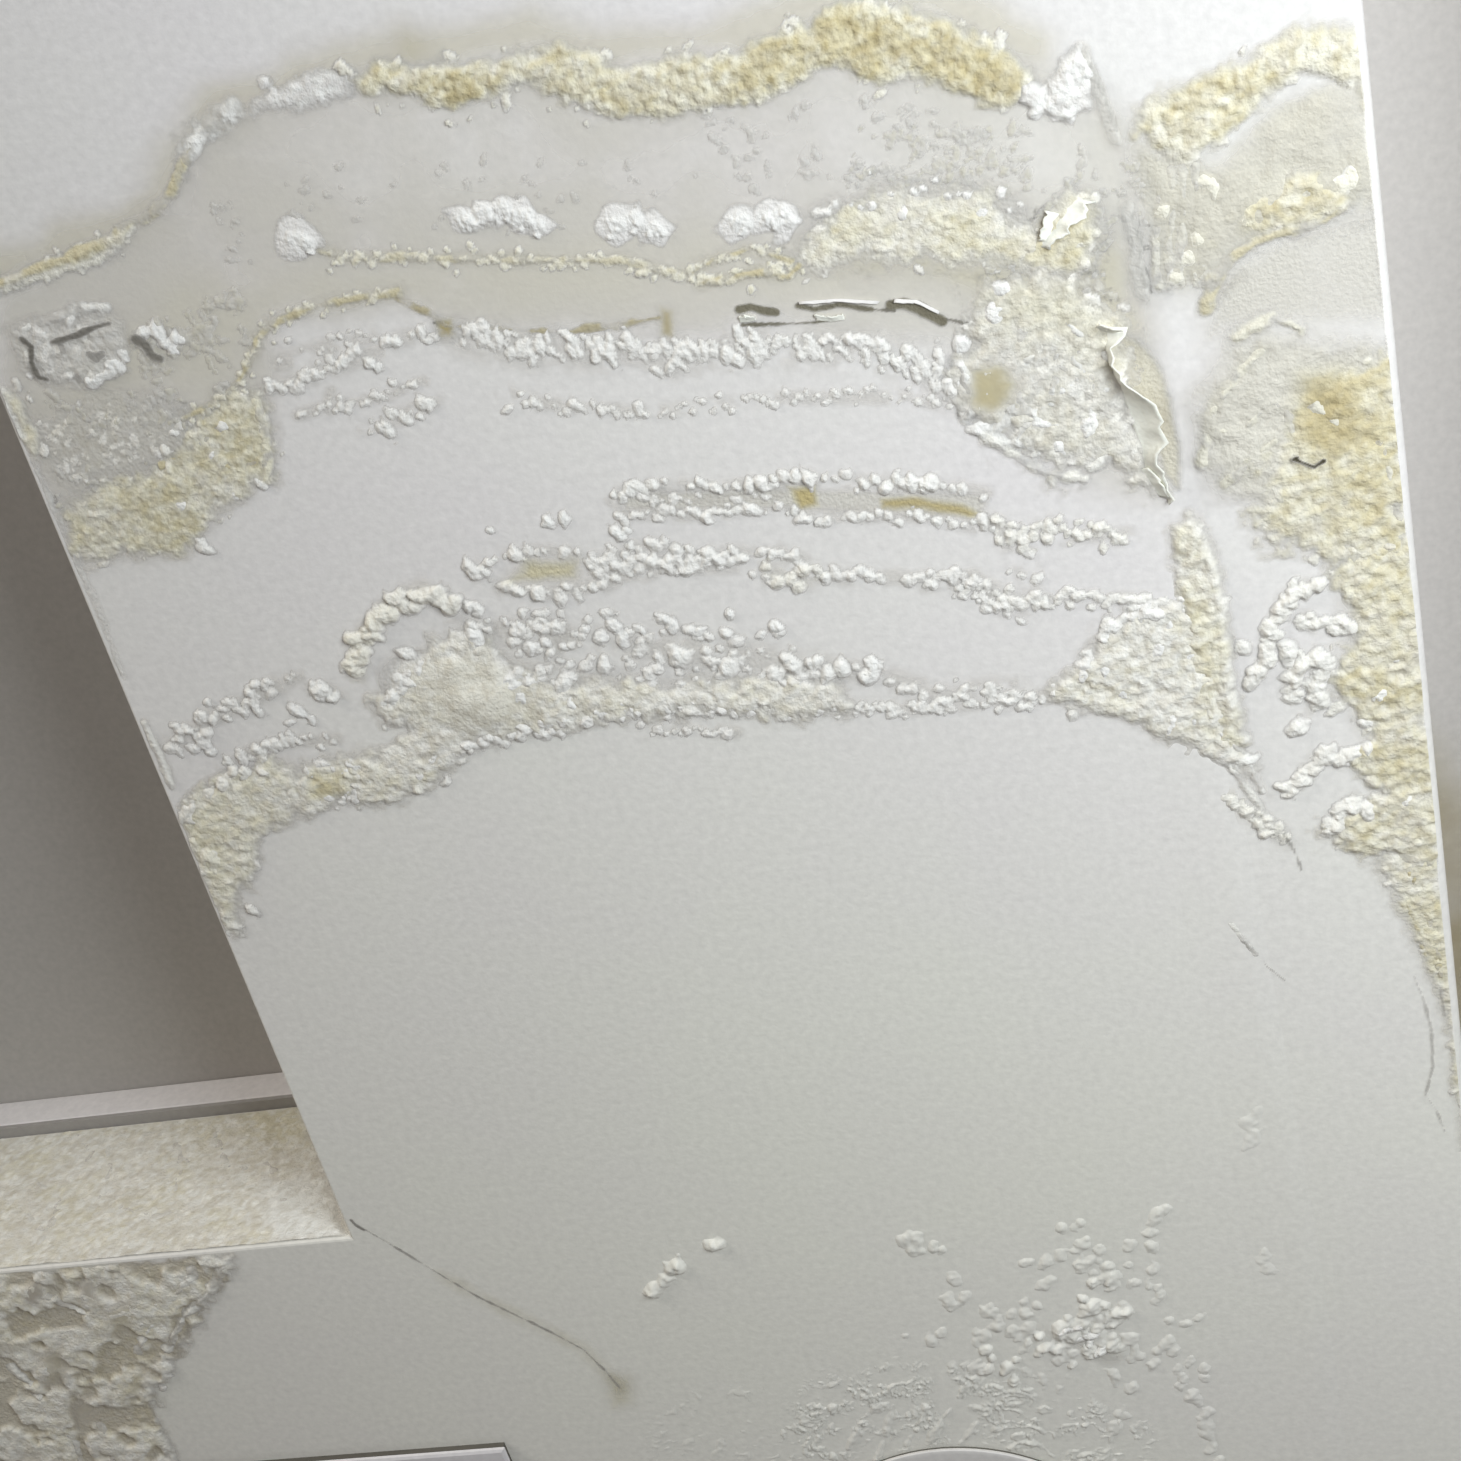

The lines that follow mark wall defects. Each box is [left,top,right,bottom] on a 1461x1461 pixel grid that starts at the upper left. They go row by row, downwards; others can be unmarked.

spalling [10,301,185,390]
crack [735,298,967,327]
flaking render [943,187,1179,505]
damp [0,0,1438,938]
spalling [0,1254,235,1461]
crack [350,1219,620,1388]